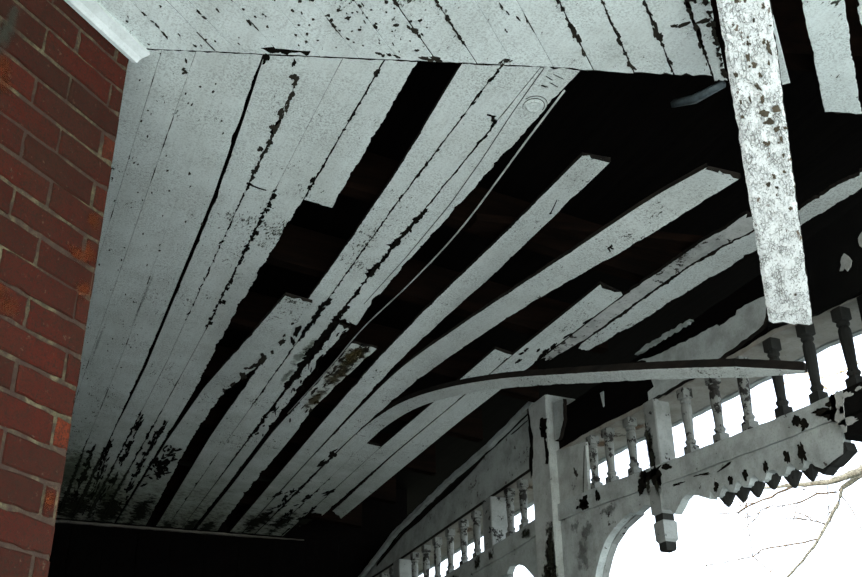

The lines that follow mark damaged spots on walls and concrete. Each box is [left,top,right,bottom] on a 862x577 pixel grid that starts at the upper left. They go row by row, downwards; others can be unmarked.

peeling [642,0,738,78]
peeling [249,74,299,182]
peeling [453,58,510,129]
peeling [739,36,788,158]
peeling [369,208,428,277]
peeling [840,253,852,271]
peeling [222,210,392,413]
peeling [515,333,573,364]
leakage [57,450,157,526]
peeling [527,409,549,477]
peeling [693,462,748,492]
peeling [783,386,862,464]